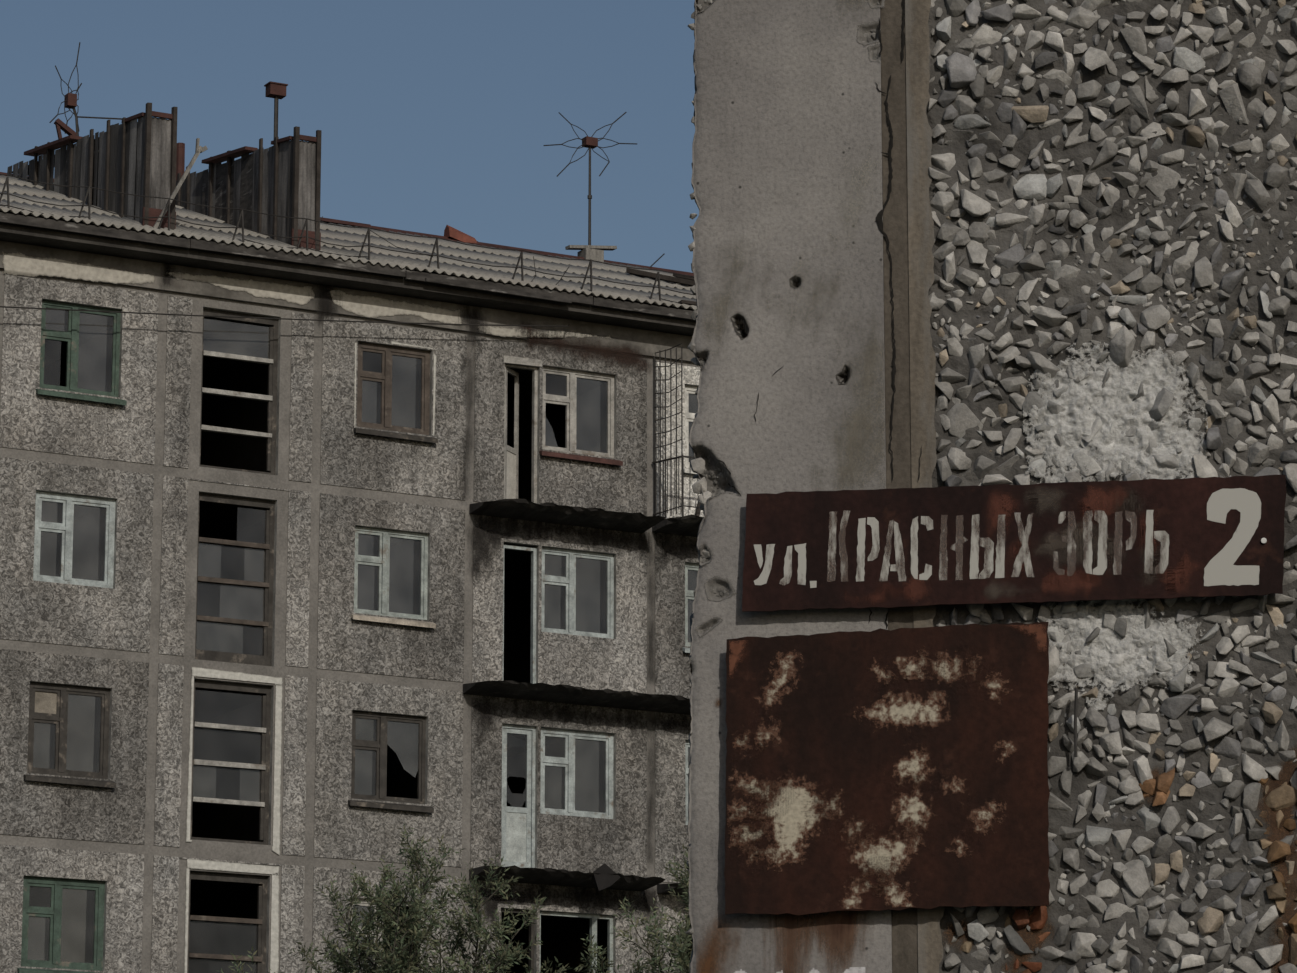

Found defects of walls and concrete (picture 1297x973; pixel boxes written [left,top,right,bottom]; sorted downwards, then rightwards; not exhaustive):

crack [875,0,922,481]
spalling [693,444,739,500]
corrosion [1010,624,1047,652]
corrosion [1254,748,1297,973]
corrosion [697,924,727,973]